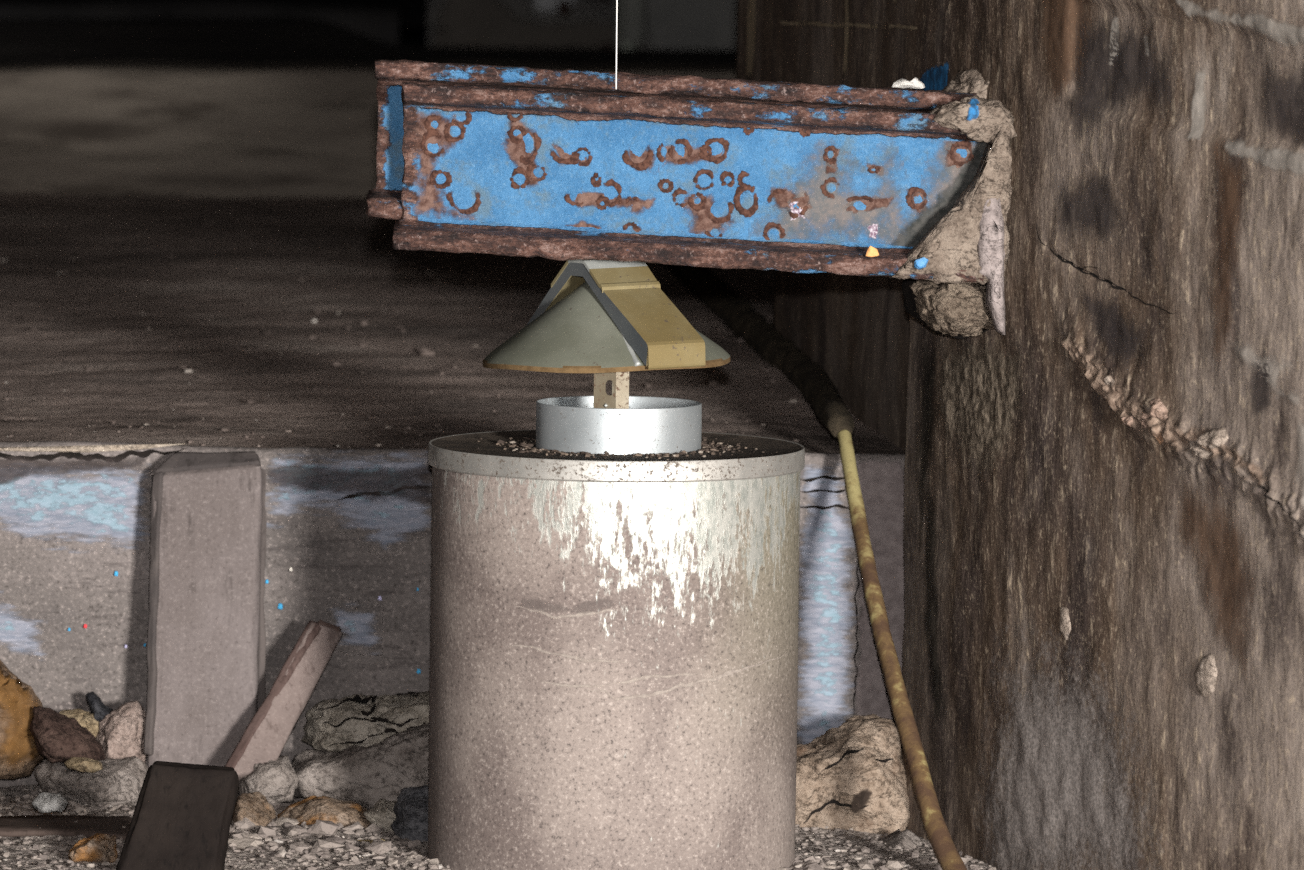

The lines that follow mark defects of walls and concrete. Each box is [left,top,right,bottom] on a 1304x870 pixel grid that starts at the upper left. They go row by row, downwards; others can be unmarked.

corrosion [415,112,482,219]
corrosion [506,113,927,240]
damp [1061,179,1116,235]
damp [1072,17,1171,129]
damp [1225,77,1304,174]
crack [1036,224,1174,314]
crack [0,448,186,462]
spalling [1061,343,1265,484]